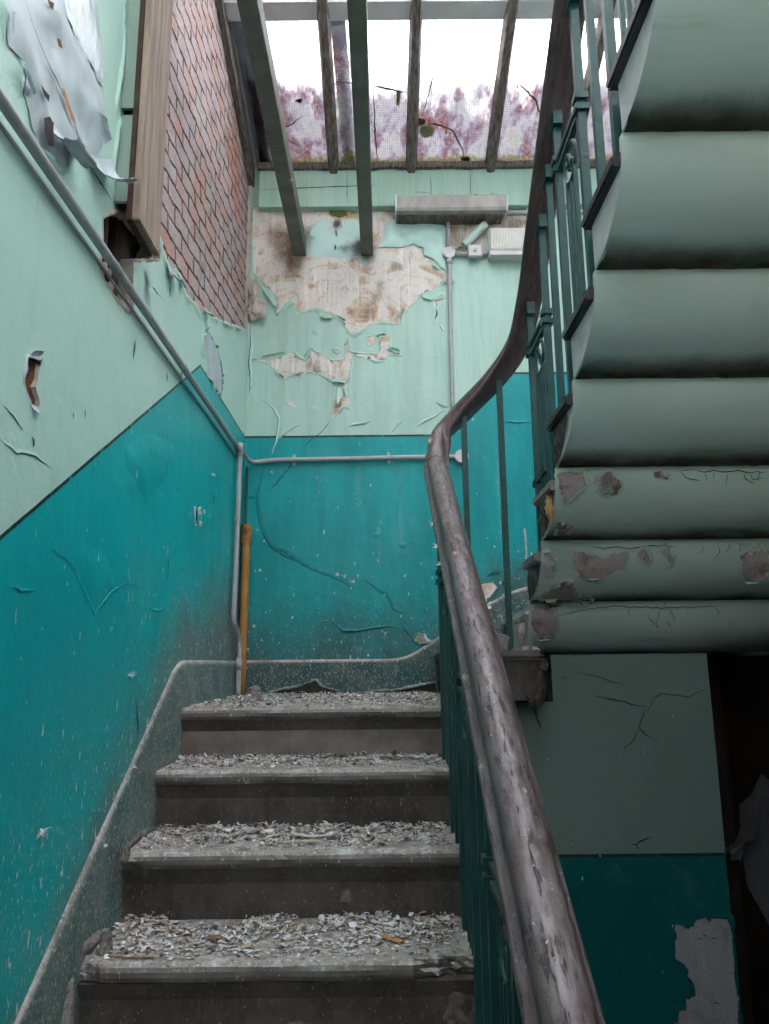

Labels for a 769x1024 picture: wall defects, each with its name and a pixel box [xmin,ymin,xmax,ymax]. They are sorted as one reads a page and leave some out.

spalling [0,0,527,419]
crack [243,326,413,639]
peeling [554,467,624,506]
crack [679,469,768,486]
crack [53,549,166,618]
peeling [528,548,630,644]
crack [561,672,654,750]
peeling [670,912,743,1024]